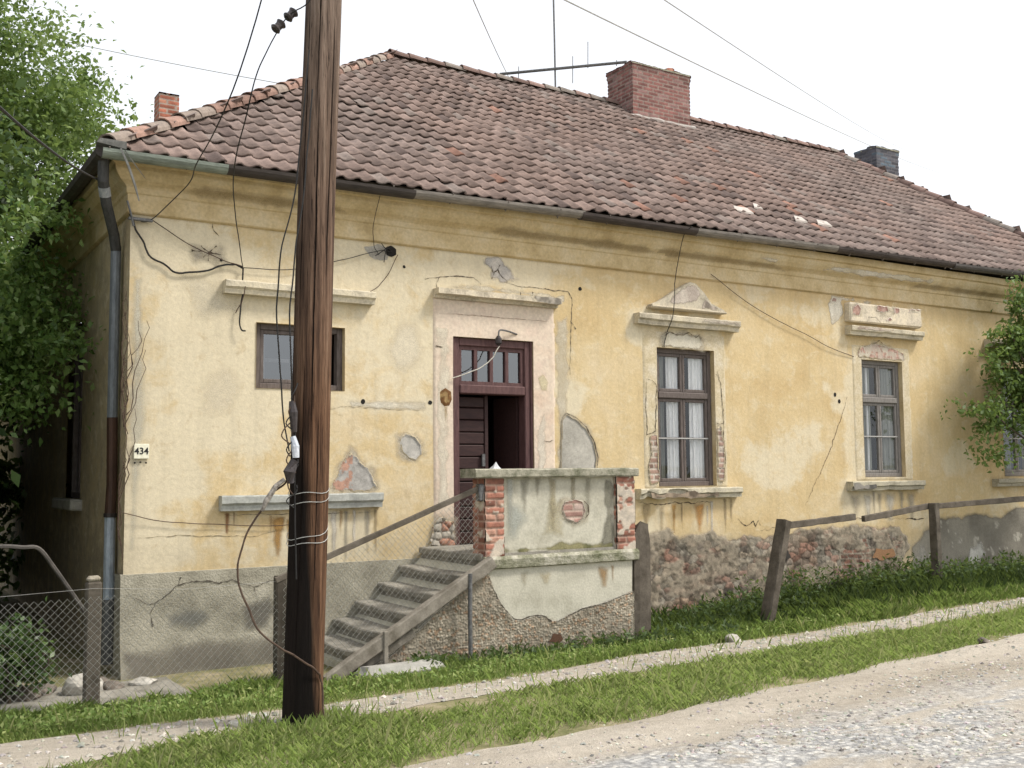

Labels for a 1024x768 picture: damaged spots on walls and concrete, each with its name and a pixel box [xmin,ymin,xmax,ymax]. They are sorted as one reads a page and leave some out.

crack [126,0,419,653]
crack [427,265,576,362]
spalling [464,257,564,304]
spalling [671,285,739,325]
spalling [828,296,920,361]
spalling [538,320,598,468]
spalling [329,448,378,494]
spalling [397,433,422,460]
spalling [648,425,725,499]
flaking render [649,527,774,615]
flaking render [781,524,910,590]
spalling [378,574,635,665]